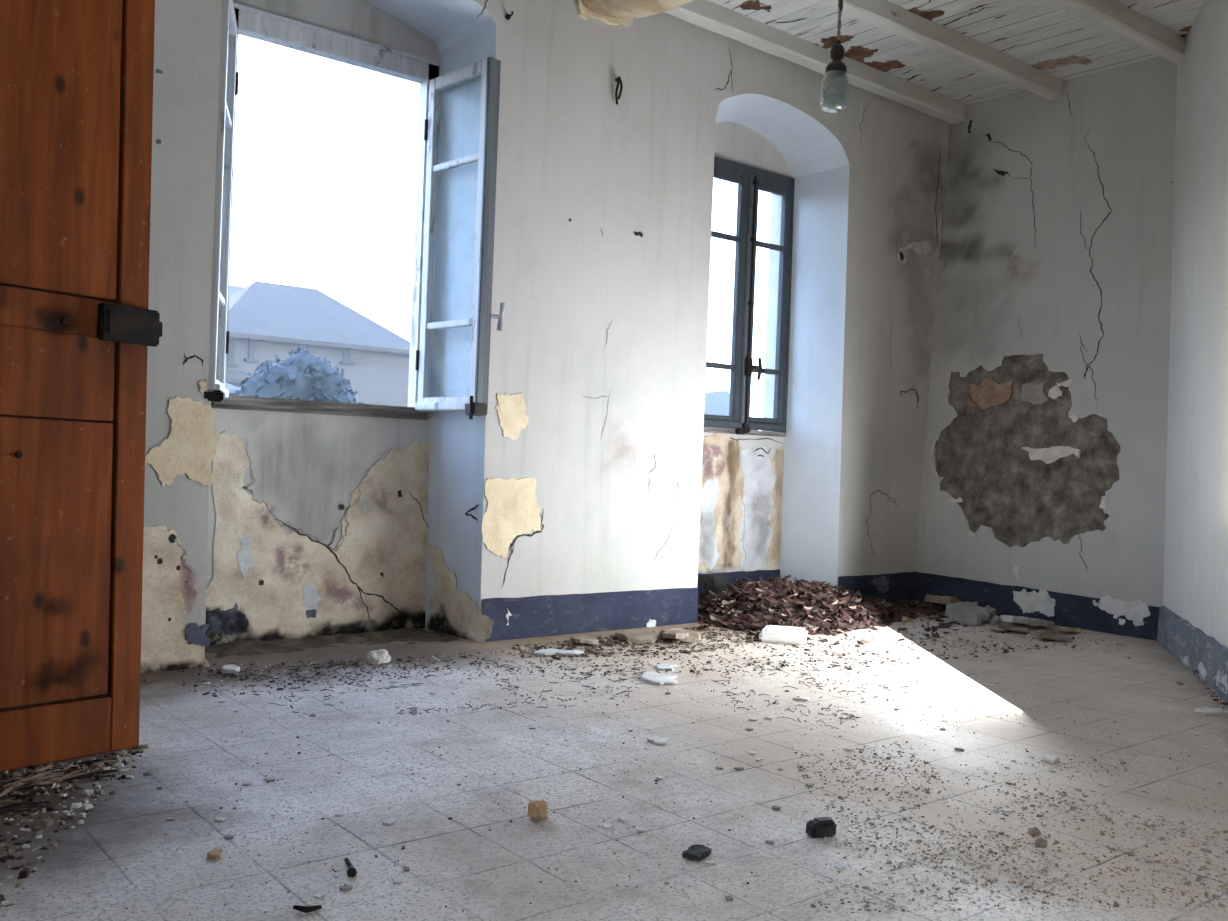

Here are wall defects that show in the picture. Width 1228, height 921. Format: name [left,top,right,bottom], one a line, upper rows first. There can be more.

peeling [732,0,806,23]
peeling [813,35,921,81]
peeling [905,0,1006,34]
crack [990,141,1036,250]
crack [1067,94,1112,412]
flaking render [495,393,529,440]
flaking render [930,354,1121,548]
flaking render [140,380,512,675]
flaking render [481,477,544,560]
crack [275,519,399,621]
peeling [1013,565,1056,617]
peeling [1093,593,1150,626]